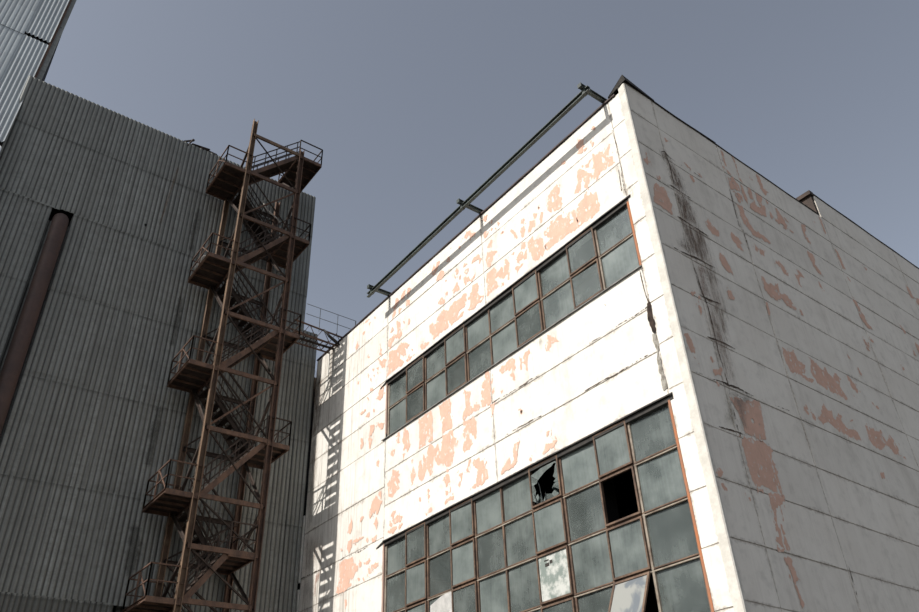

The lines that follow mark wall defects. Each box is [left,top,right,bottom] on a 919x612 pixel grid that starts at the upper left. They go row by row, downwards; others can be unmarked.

peeling [644,153,673,215]
leakage [662,153,703,255]
peeling [719,150,823,289]
peeling [357,126,615,449]
peeling [761,260,804,316]
spalling [647,301,667,391]
peeling [684,329,696,359]
peeling [782,347,862,400]
peeling [390,350,532,516]
peeling [804,404,906,459]
peeling [336,470,400,609]
peeling [729,396,805,609]